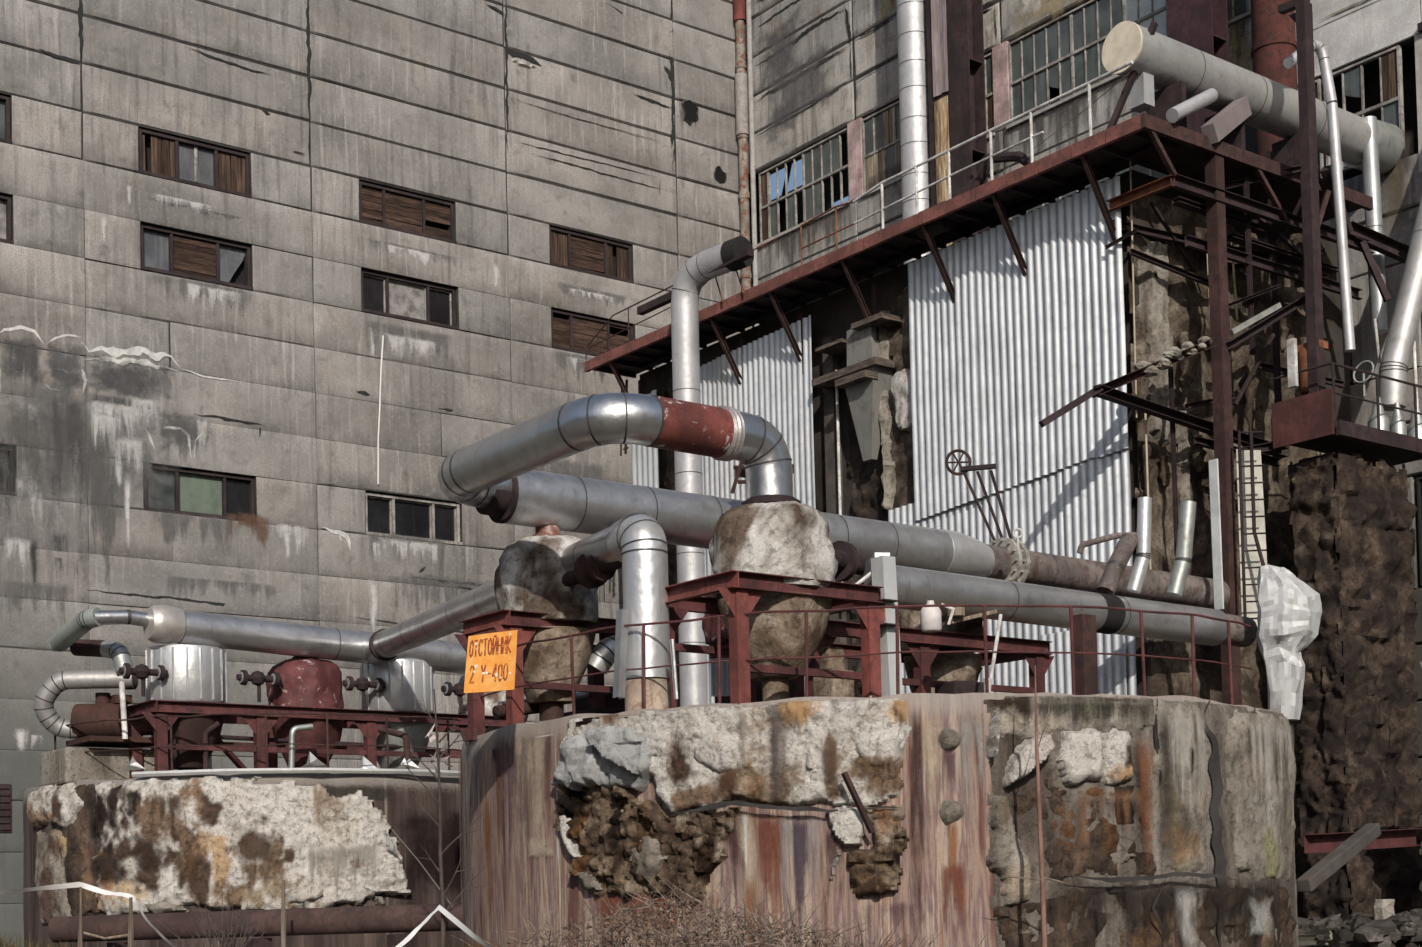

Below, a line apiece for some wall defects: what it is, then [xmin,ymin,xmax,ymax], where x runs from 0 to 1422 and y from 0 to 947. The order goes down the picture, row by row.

leakage [0,325,238,568]
spalling [27,775,411,915]
rust [484,754,501,914]
spalling [554,696,912,903]
rust [721,711,746,787]
rust [747,818,781,947]
rust [773,702,808,777]
rust [824,742,836,777]
rust [943,751,956,775]
rust [944,828,964,920]
spalling [984,696,1299,947]